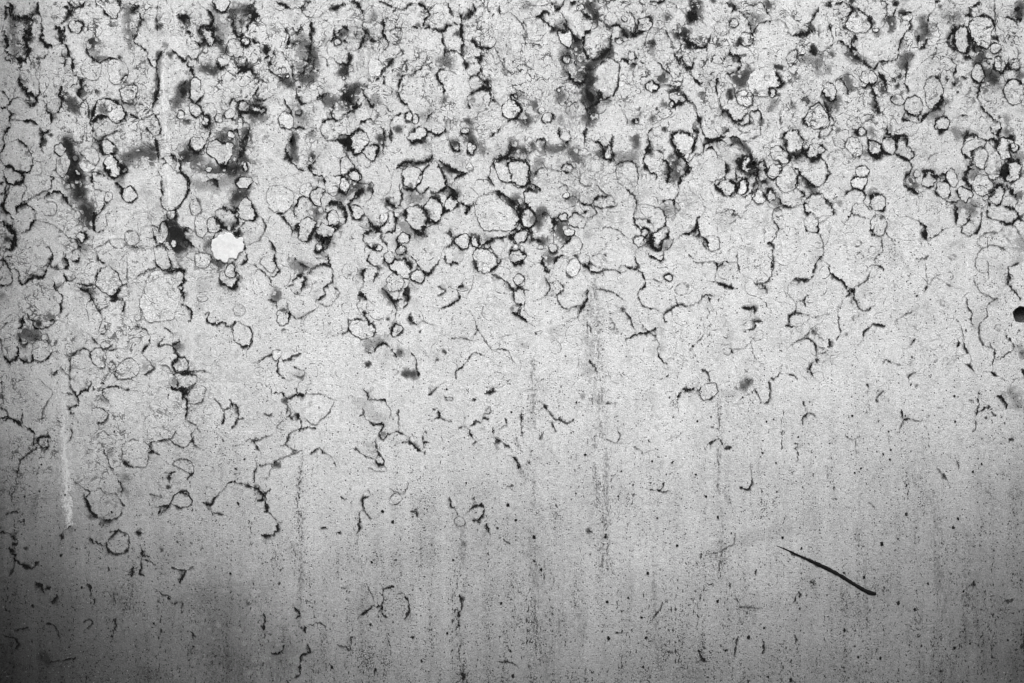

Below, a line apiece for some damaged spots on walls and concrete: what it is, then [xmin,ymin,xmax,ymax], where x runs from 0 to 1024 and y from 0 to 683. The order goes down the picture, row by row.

water stain [572,33,596,124]
water stain [49,133,94,225]
crack [726,0,1024,439]
crack [0,0,782,660]
crack [794,401,816,475]